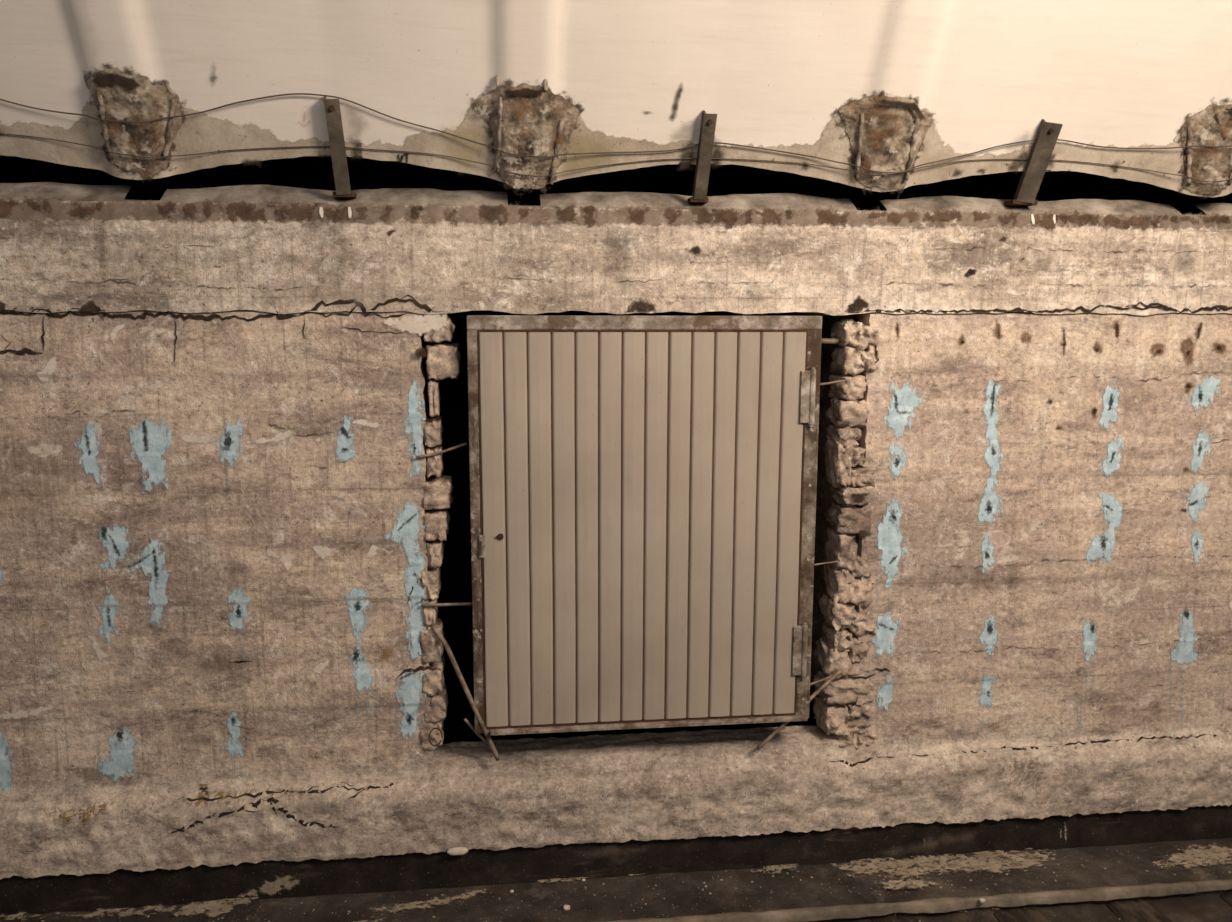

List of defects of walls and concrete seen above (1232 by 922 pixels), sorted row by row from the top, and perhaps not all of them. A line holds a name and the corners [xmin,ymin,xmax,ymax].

spalling [0,64,1032,193]
peeling [1045,98,1232,197]
crack [0,278,443,361]
crack [848,282,1232,315]
rust [1151,344,1164,356]
rust [1181,323,1202,364]
crack [840,503,869,536]
crack [168,782,398,834]